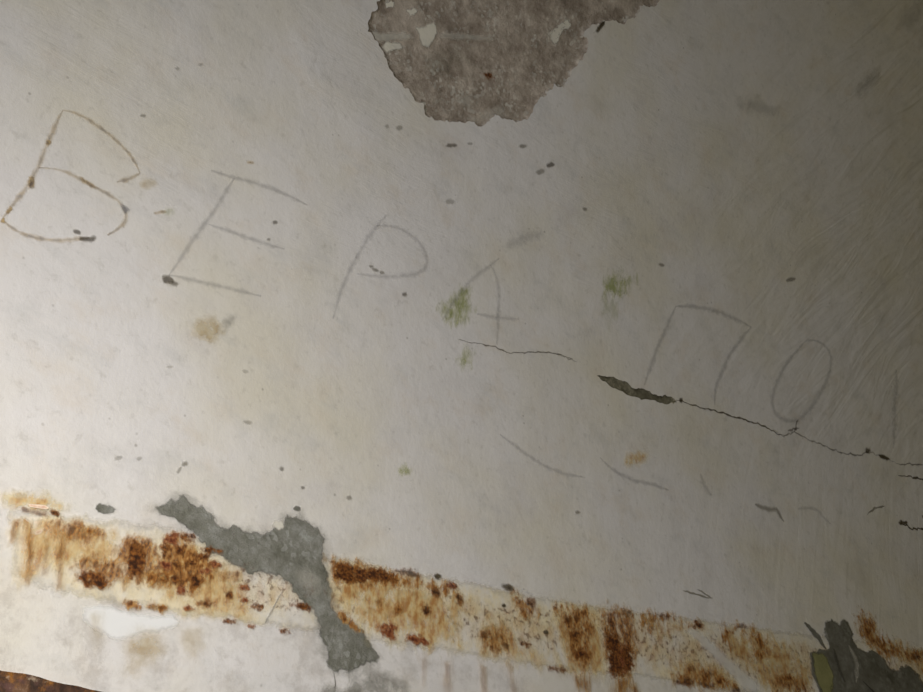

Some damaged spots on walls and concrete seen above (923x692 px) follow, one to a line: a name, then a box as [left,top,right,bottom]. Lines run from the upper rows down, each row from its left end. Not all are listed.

flaking render [368,0,659,127]
crack [598,375,784,437]
crack [866,449,923,480]
peeling [96,503,115,514]
corrosion [8,493,264,623]
peeling [157,495,379,671]
corrosion [330,557,463,649]
corrosion [502,584,540,620]
corrosion [0,670,101,692]
corrosion [549,603,703,692]
corrosion [671,663,740,692]
peeling [804,619,923,692]